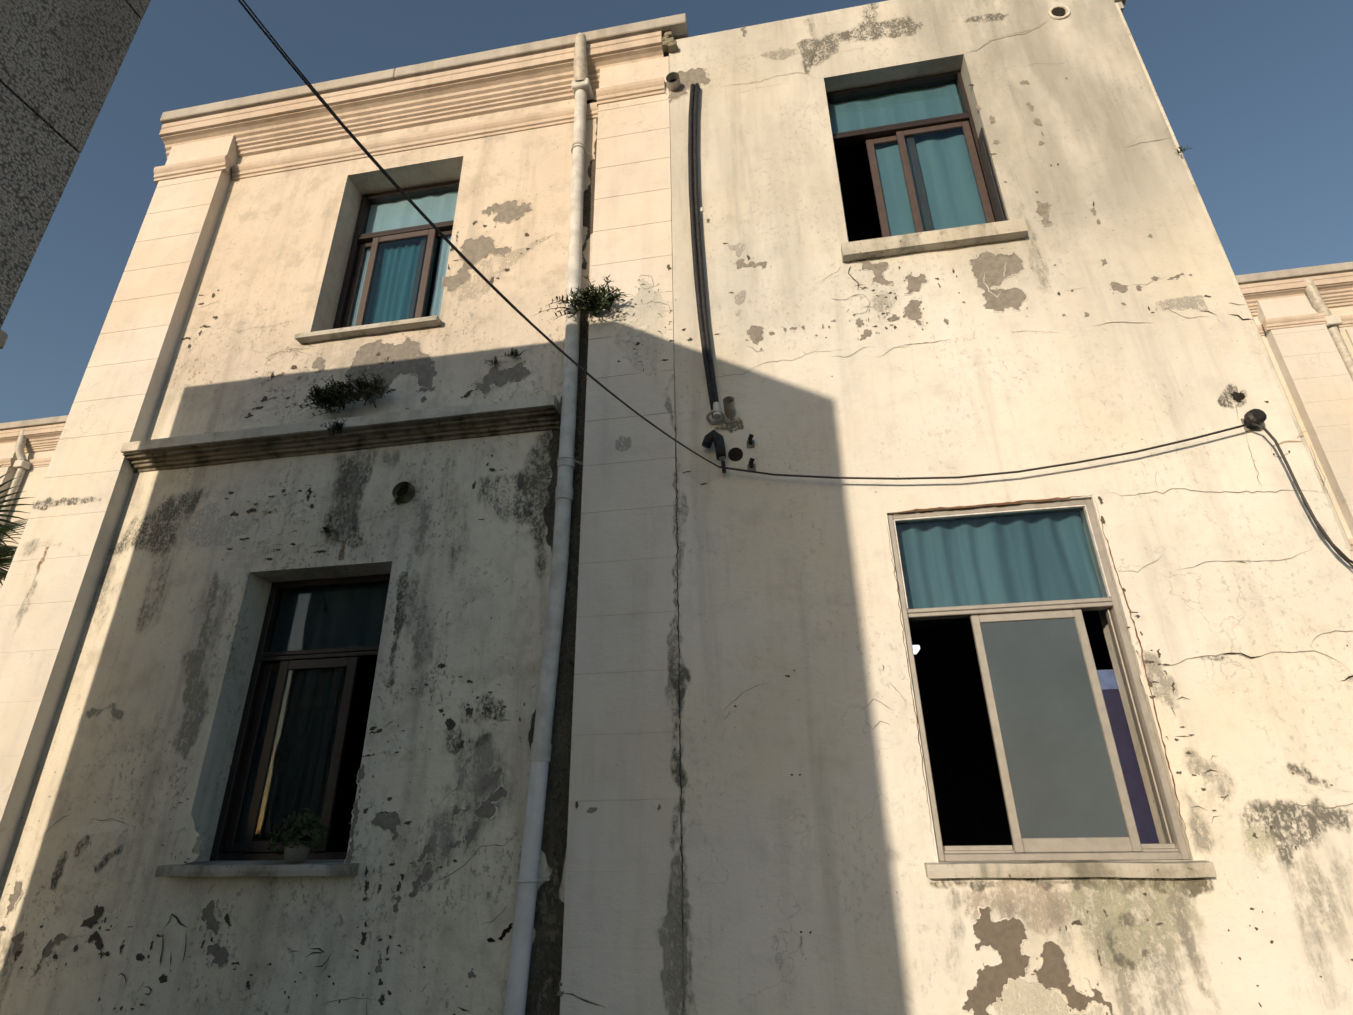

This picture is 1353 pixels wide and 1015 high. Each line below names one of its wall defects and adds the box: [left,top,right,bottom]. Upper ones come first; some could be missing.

peeling [442,199,549,299]
peeling [723,243,767,270]
peeling [746,248,1032,352]
peeling [345,337,437,409]
damp [103,489,203,582]
damp [87,704,123,719]
damp [176,575,226,758]
crack [1154,630,1353,681]
damp [1287,764,1347,792]
damp [1243,799,1349,865]
peeling [0,880,253,1011]
peeling [961,905,1115,1015]